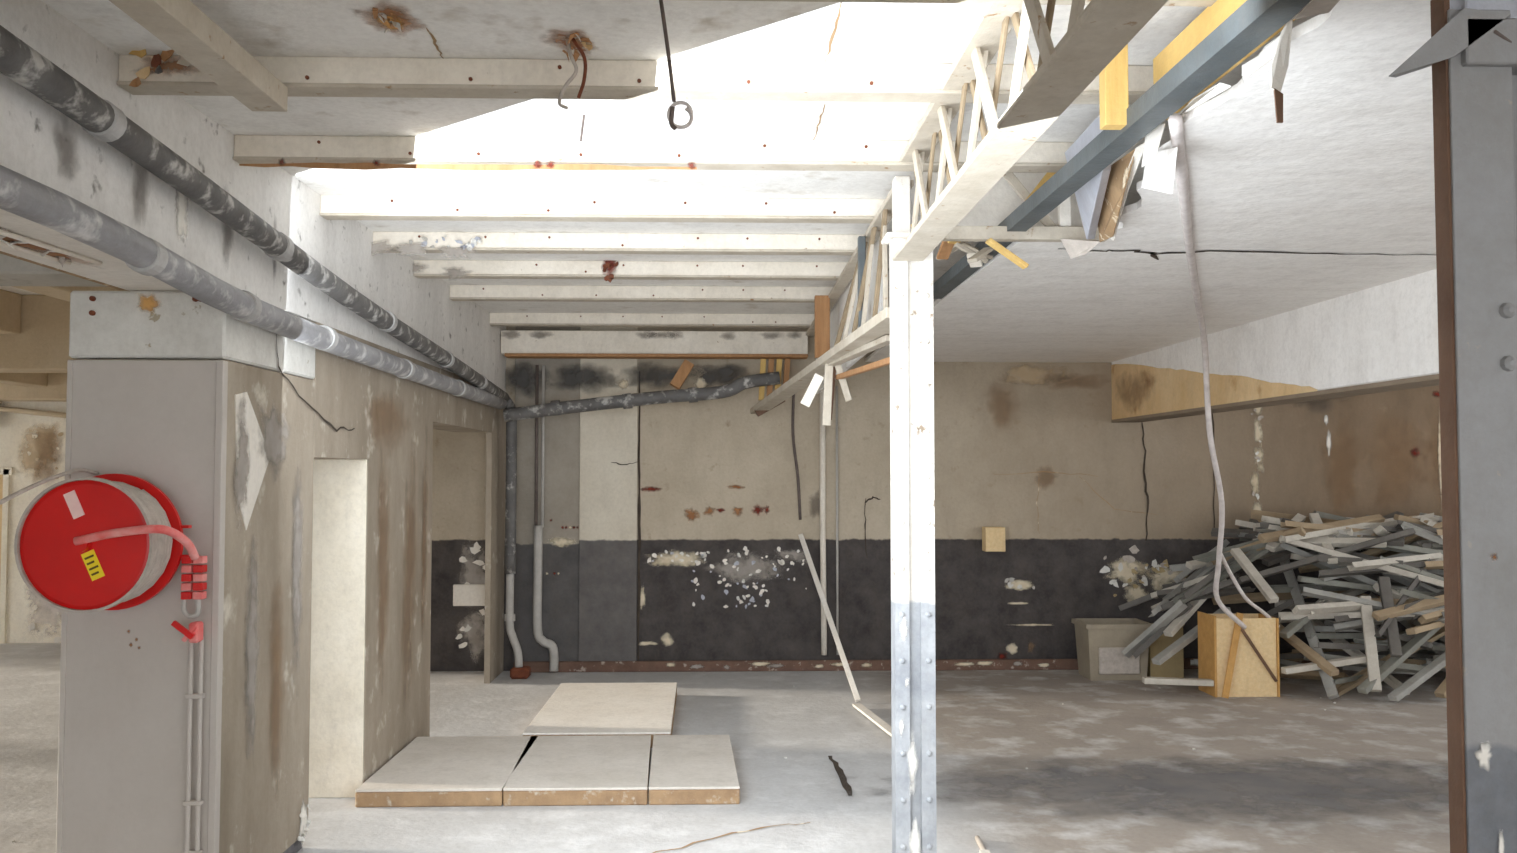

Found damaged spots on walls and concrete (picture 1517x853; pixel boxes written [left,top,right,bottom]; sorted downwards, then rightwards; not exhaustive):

crack [1000,422,1157,541]
peeling [647,546,807,609]
flaking render [639,633,703,668]